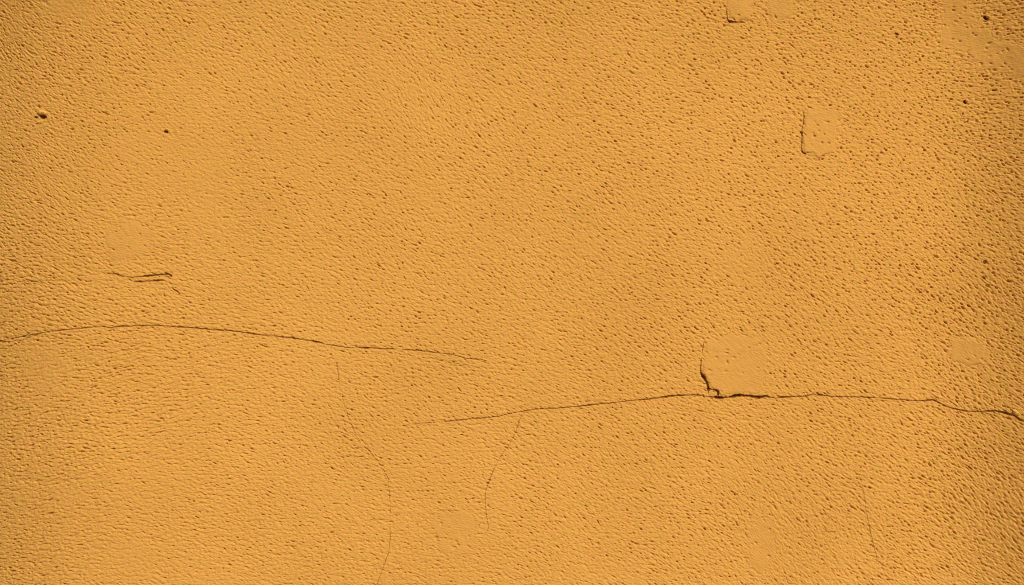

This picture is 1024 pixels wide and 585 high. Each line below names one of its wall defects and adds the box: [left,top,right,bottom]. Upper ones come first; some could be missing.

crack [107,273,179,293]
crack [0,325,486,585]
crack [431,343,1024,531]